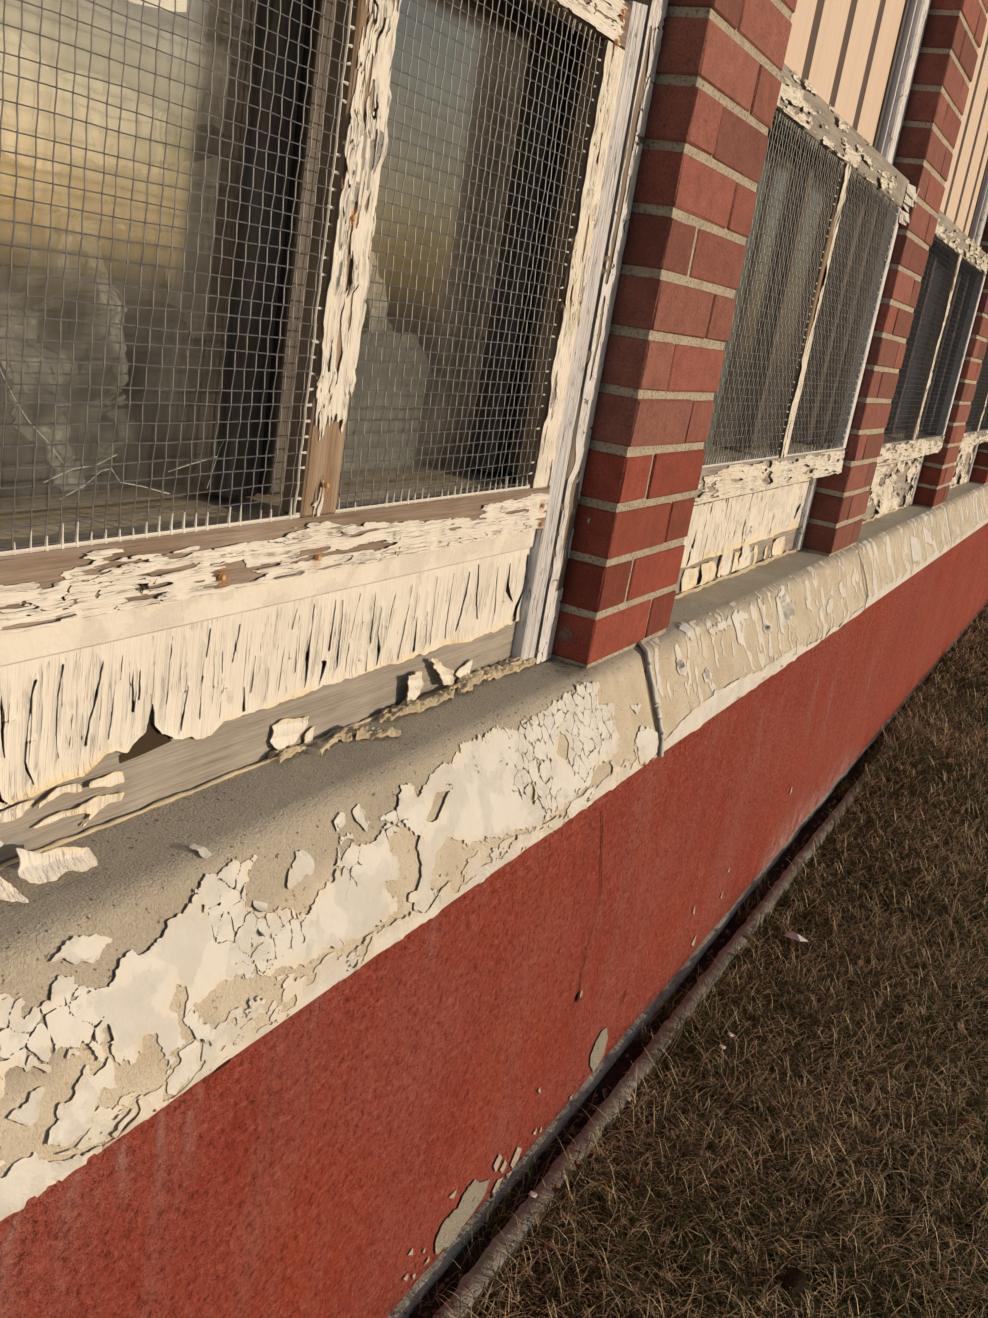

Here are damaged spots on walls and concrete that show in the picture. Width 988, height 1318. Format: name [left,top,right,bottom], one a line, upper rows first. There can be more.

crack [0,0,668,809]
peeling [315,0,402,441]
peeling [557,0,628,45]
peeling [681,72,920,592]
peeling [0,214,988,1221]
spalling [403,1147,522,1281]